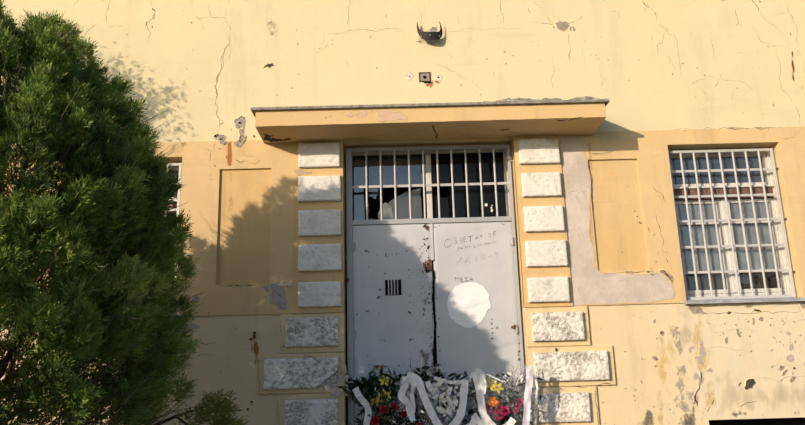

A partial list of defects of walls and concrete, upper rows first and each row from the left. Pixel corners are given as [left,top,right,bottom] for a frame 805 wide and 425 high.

spalling [553,20,576,32]
crack [707,0,805,139]
spalling [213,115,247,148]
peeling [688,302,805,383]
water stain [674,366,694,425]
peeling [677,334,713,413]
spalling [737,378,756,390]